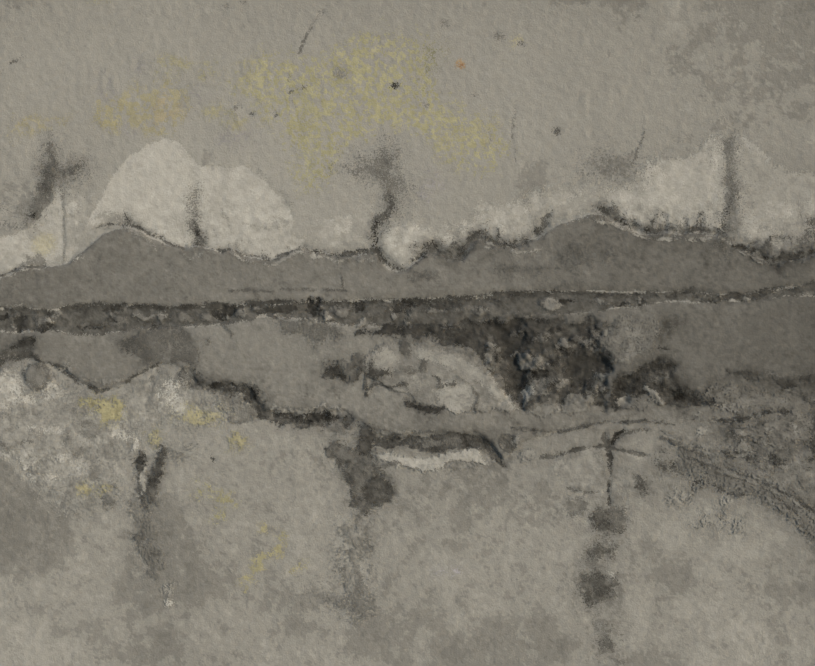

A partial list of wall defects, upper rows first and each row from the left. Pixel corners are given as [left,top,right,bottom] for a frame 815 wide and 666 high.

water stain [0,16,815,269]
crack [0,200,815,337]
crack [48,361,159,394]
water stain [0,313,252,608]
spalling [177,364,354,436]
water stain [279,420,419,635]
spalling [320,312,815,547]
water stain [551,494,638,666]
water stain [634,446,745,501]
water stain [712,386,815,475]